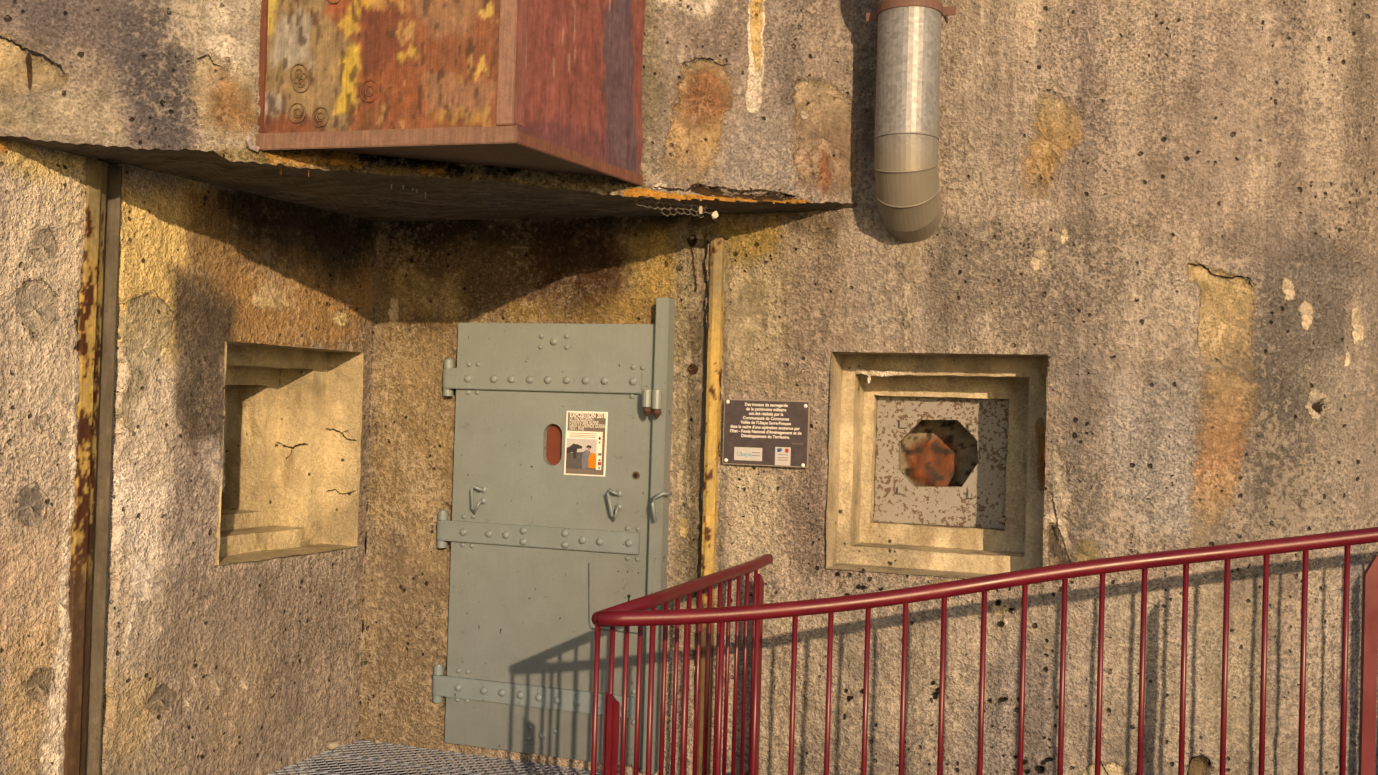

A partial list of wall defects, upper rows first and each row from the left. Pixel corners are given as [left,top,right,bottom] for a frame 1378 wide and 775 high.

spalling [0,34,67,93]
spalling [664,57,733,169]
water stain [745,0,766,113]
spalling [791,78,858,186]
spalling [1187,262,1255,364]
spalling [1083,762,1129,775]
spalling [1187,755,1211,775]